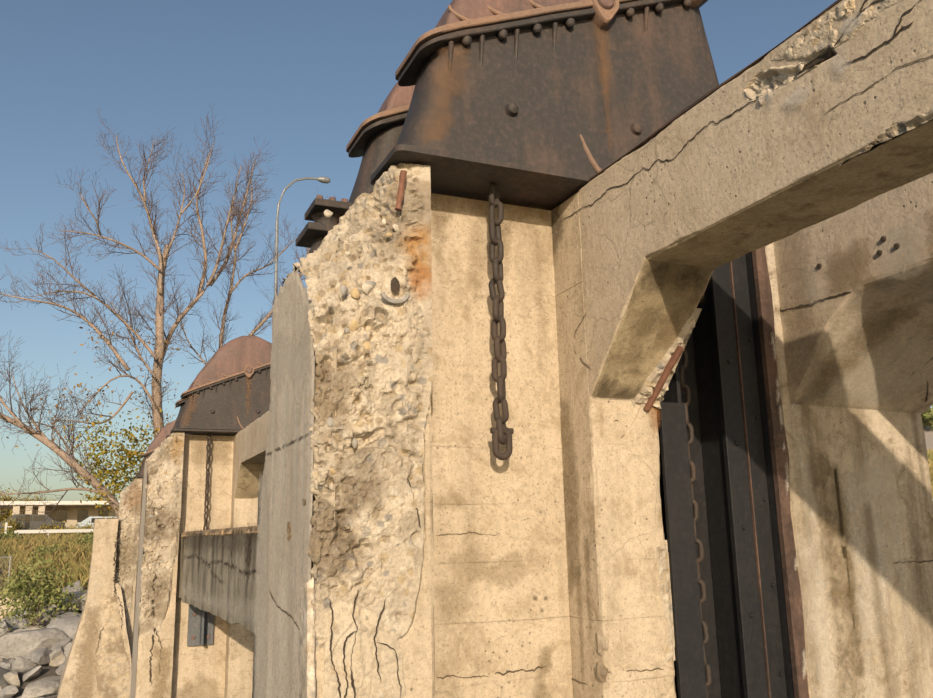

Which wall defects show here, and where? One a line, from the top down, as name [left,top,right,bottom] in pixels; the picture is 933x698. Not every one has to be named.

peeling [744,0,904,105]
crack [831,0,920,65]
crack [824,55,933,114]
crack [562,99,757,221]
spalling [839,110,933,166]
spalling [631,308,702,414]
spalling [282,163,433,698]
crack [149,572,162,685]
spalling [92,432,260,698]
crack [184,554,299,630]
crack [329,593,402,698]
crack [436,666,545,679]